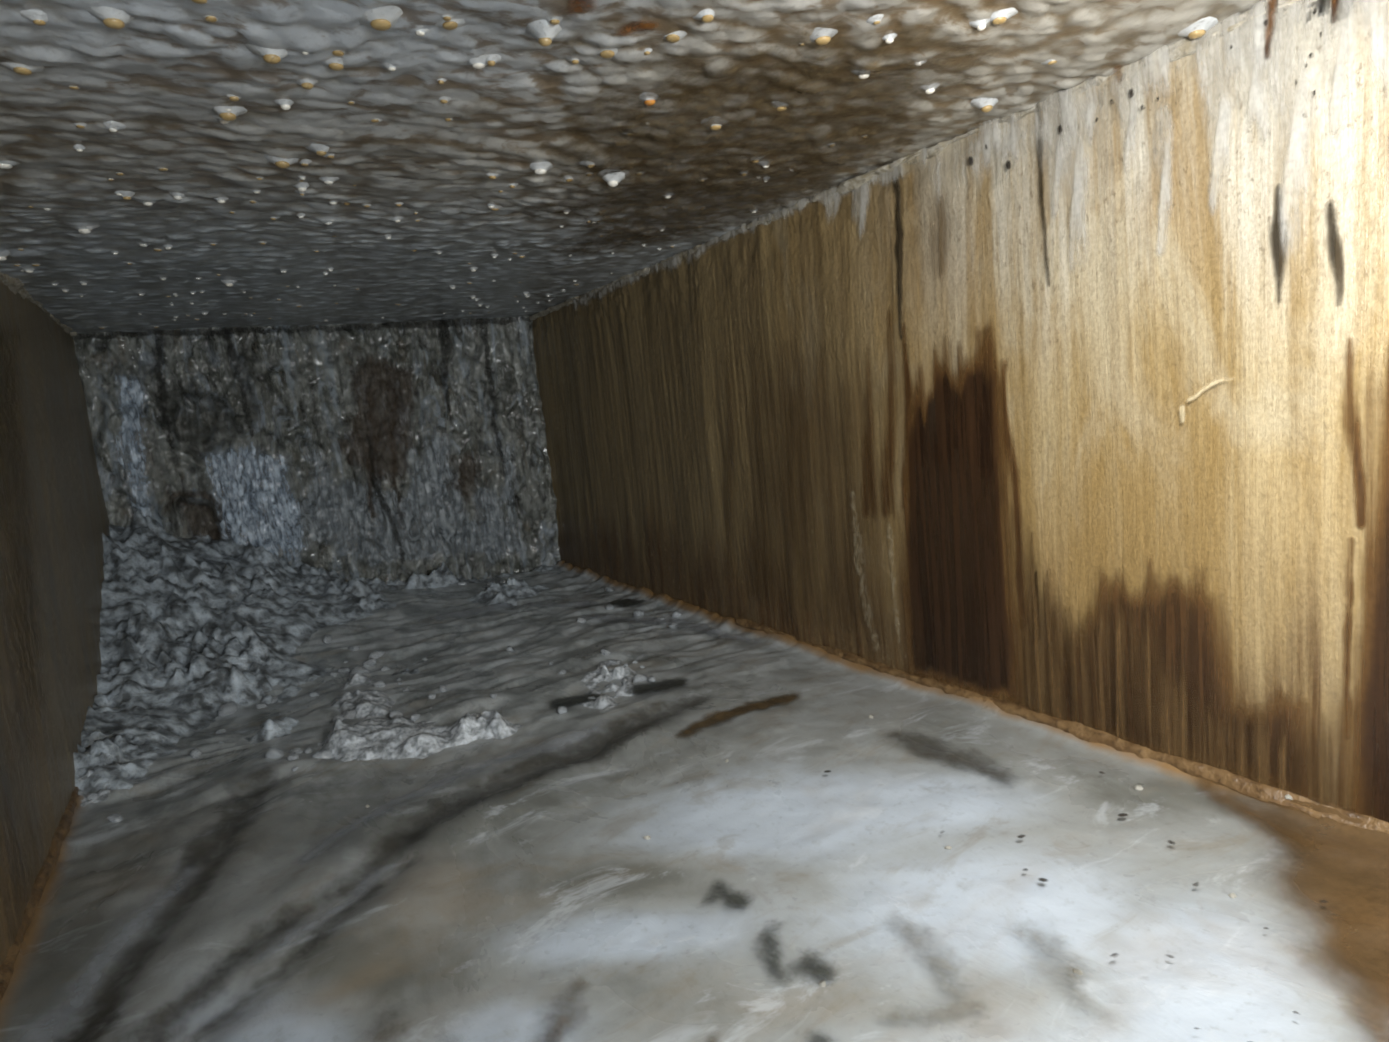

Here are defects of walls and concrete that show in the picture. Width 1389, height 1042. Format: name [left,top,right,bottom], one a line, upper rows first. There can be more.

damp [1347,0,1389,79]
damp [529,40,1109,339]
damp [1120,0,1309,302]
damp [1328,202,1344,300]
damp [116,376,151,517]
damp [205,429,526,567]
damp [1023,556,1287,790]